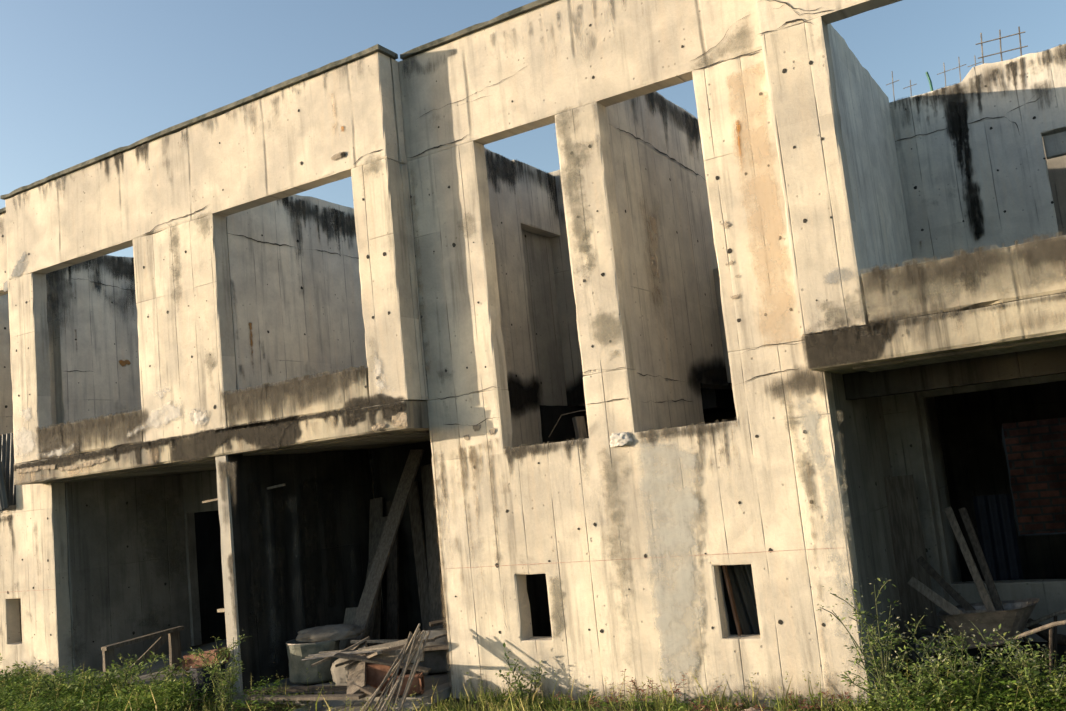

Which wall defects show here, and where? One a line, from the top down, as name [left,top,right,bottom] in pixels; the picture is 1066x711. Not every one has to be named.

crack [691,0,831,70]
damp [1037,44,1066,66]
damp [485,115,580,215]
damp [280,197,356,251]
damp [573,215,591,269]
damp [770,58,1066,539]
damp [14,366,403,523]